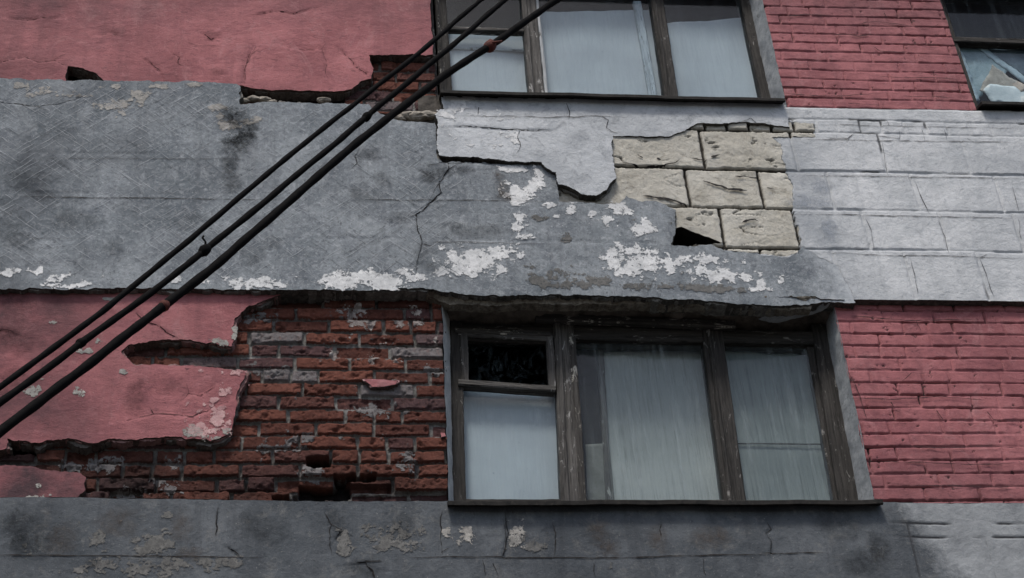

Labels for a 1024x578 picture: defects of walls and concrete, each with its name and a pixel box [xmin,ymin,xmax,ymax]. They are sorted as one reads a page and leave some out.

peeling [208,50,520,151]
crack [412,162,501,270]
peeling [0,117,855,578]